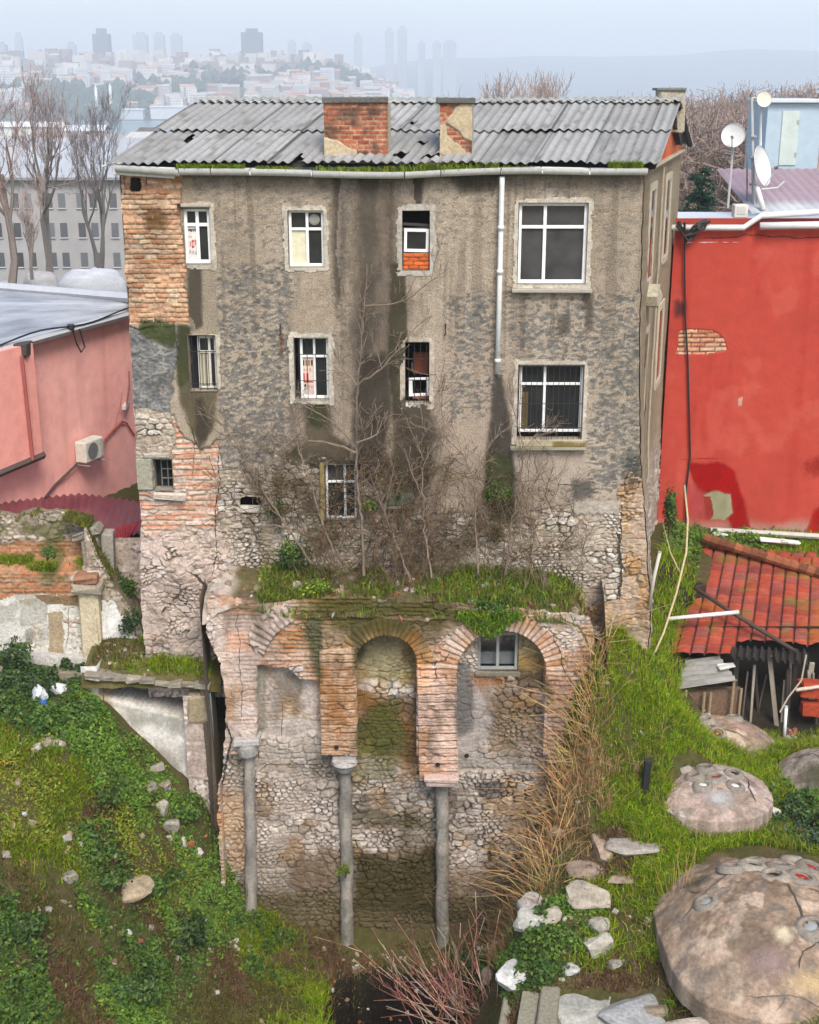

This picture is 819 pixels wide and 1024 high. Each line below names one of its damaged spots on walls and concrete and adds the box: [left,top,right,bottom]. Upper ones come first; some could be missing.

flaking render [676,329,726,354]